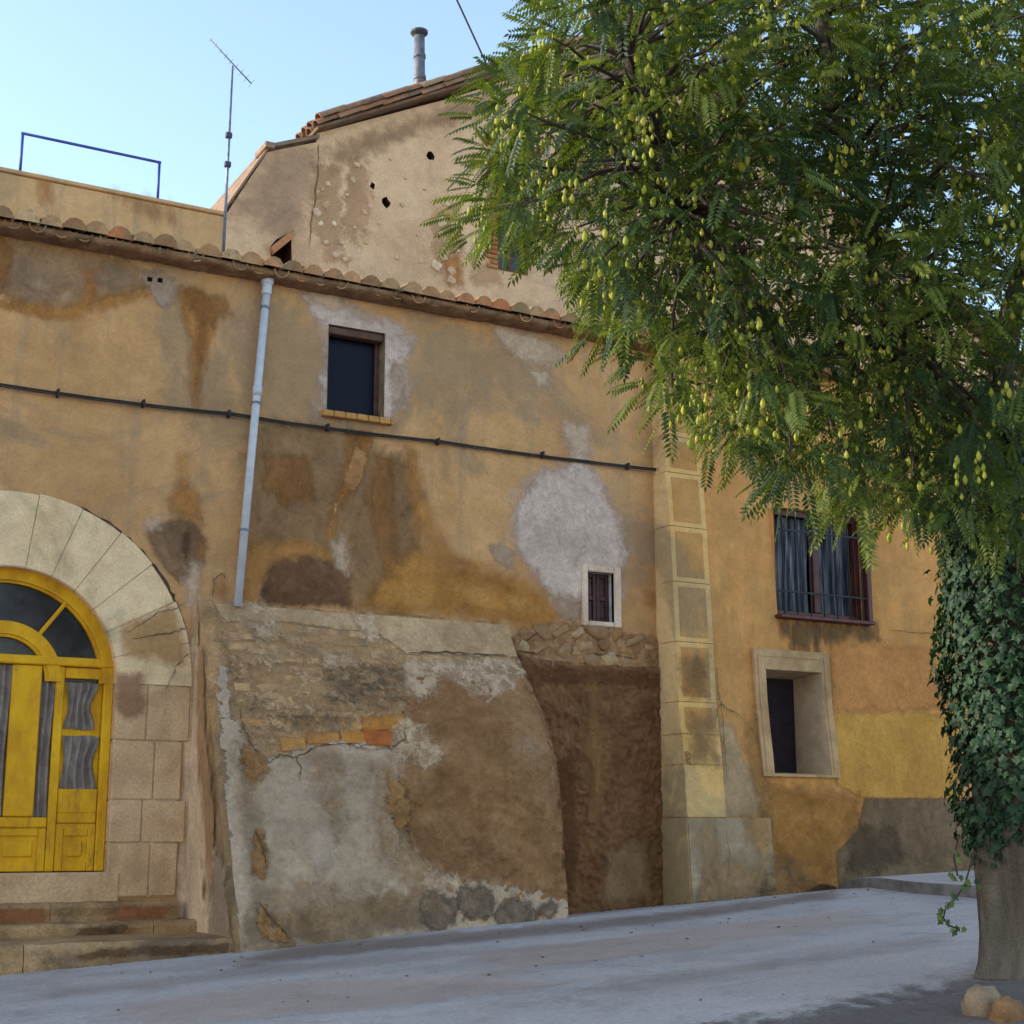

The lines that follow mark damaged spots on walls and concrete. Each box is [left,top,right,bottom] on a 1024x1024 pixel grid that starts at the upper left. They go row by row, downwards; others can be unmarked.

crack [309,145,319,242]
peeling [564,424,590,458]
leakage [236,424,557,643]
crack [81,507,189,691]
leakage [285,653,526,726]
crack [237,704,407,781]
spalling [249,828,269,880]
spalling [254,901,296,947]